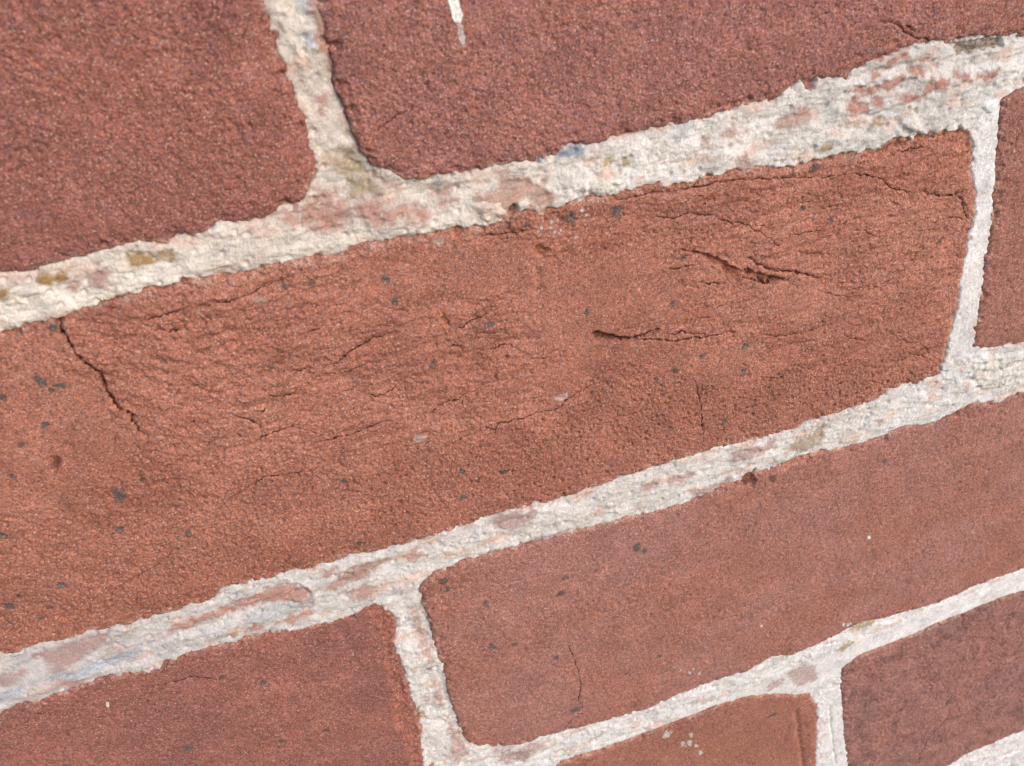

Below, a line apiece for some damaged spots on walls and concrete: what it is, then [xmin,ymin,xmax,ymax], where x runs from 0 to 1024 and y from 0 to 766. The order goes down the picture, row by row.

crack [59,318,148,445]
crack [479,228,537,236]
crack [591,328,730,342]
crack [615,172,970,386]